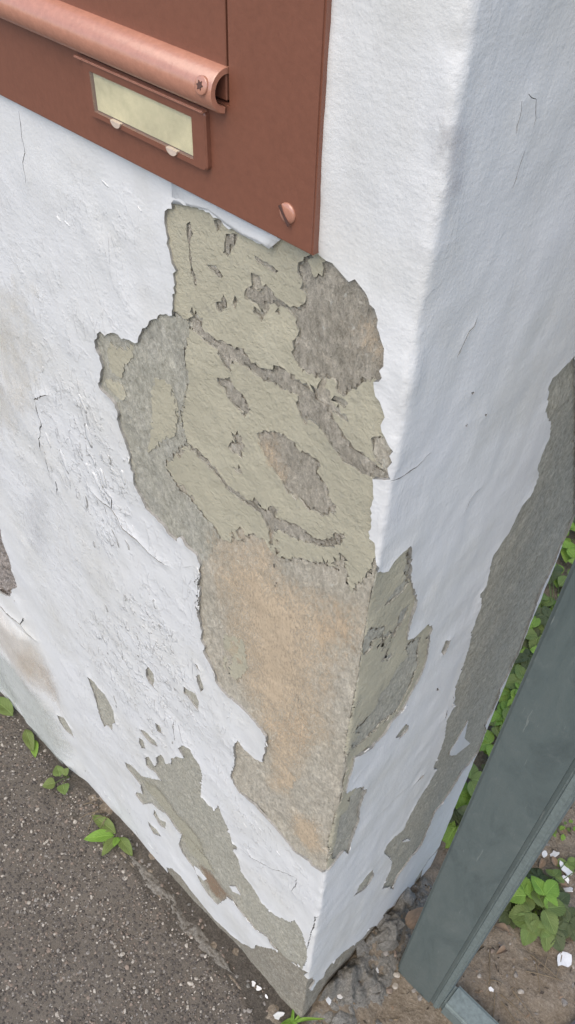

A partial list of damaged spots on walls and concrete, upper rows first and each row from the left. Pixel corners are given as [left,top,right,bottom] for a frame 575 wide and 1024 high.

spalling [0,530,17,601]
peeling [78,183,431,870]
peeling [383,359,575,892]